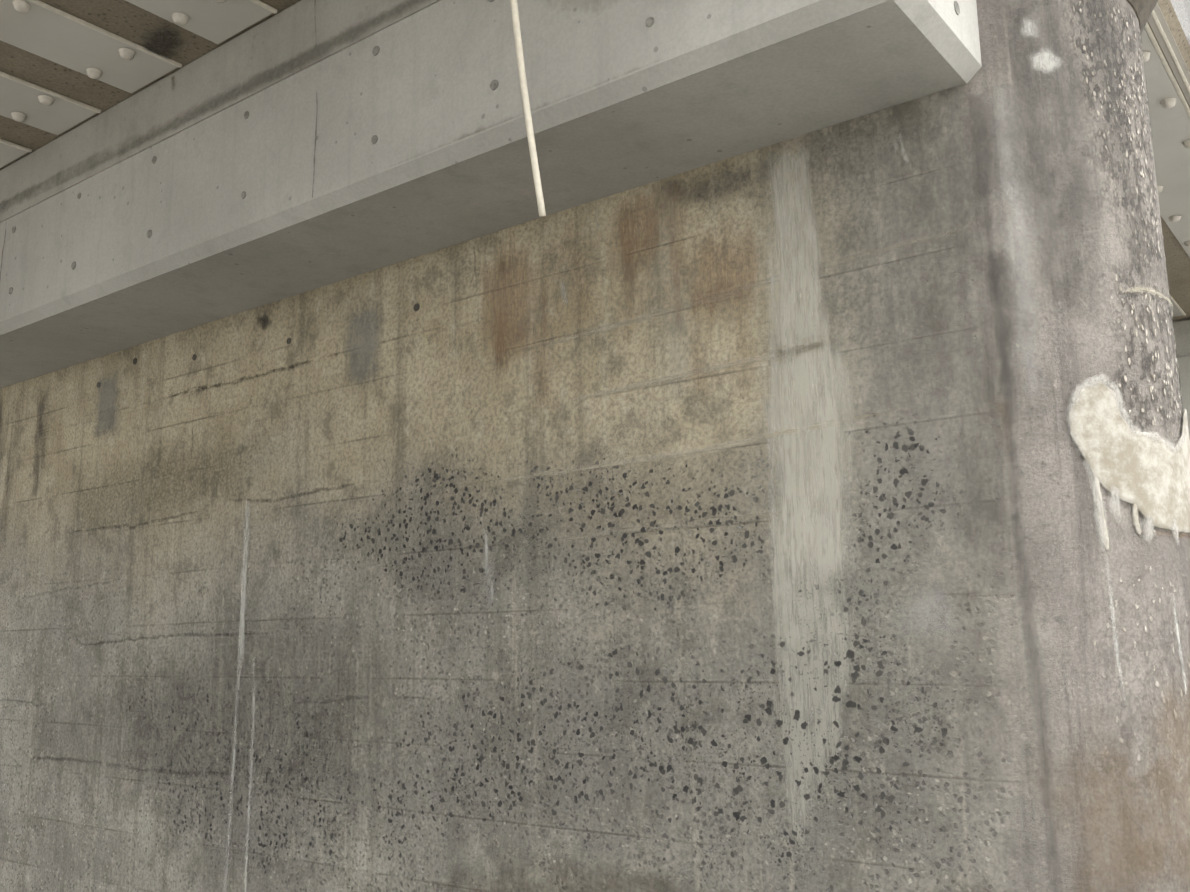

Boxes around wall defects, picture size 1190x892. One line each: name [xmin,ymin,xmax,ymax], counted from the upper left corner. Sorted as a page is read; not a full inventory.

damp [768,151,849,843]
damp [1093,483,1120,540]
damp [1071,376,1184,451]
spalling [1069,0,1190,551]